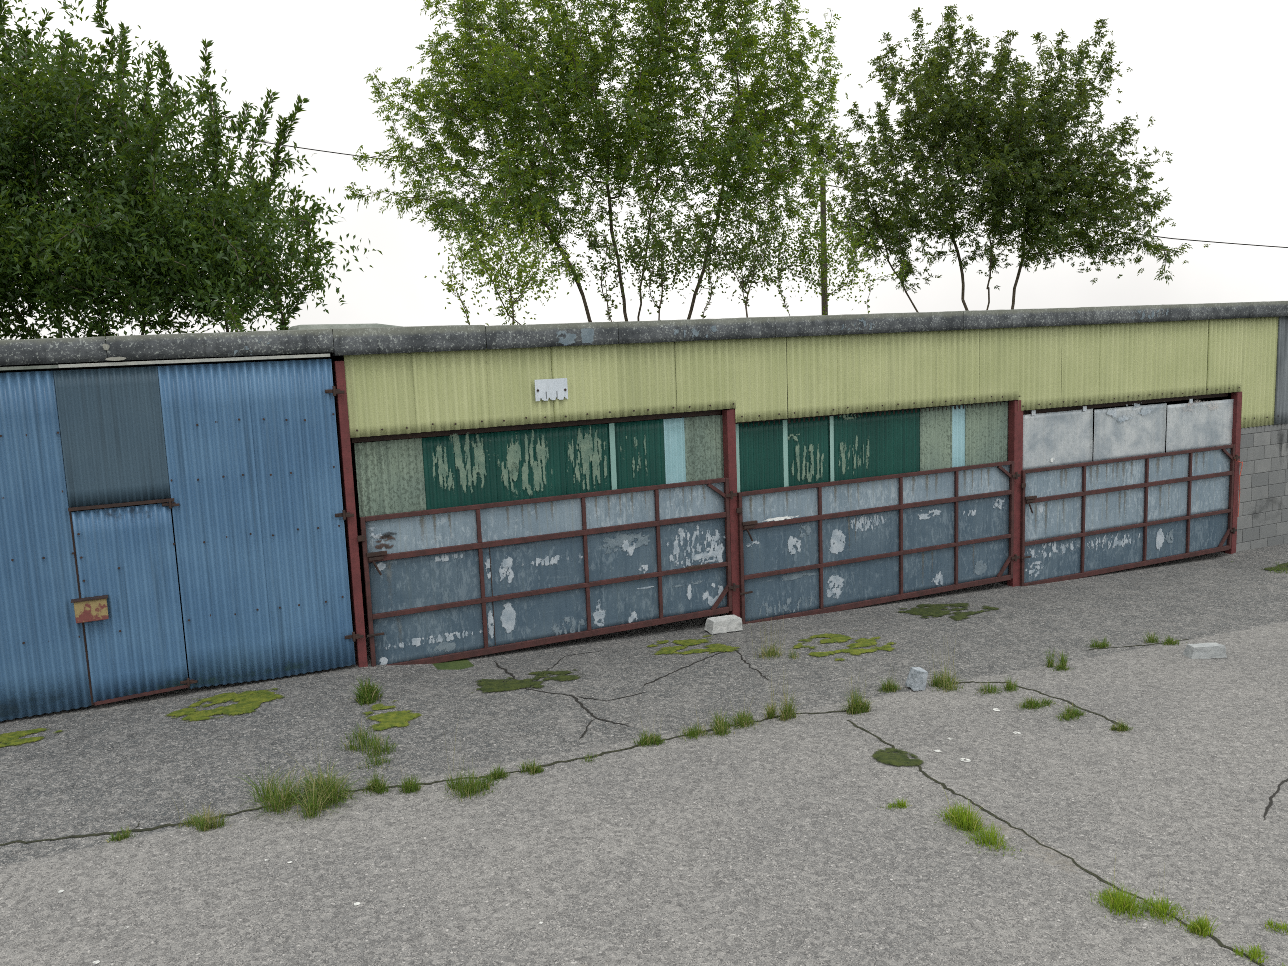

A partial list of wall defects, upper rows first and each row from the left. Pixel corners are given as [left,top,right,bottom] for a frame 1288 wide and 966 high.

peeling [433,430,552,495]
peeling [568,426,647,490]
peeling [788,434,824,482]
peeling [839,436,869,474]
peeling [485,557,514,583]
peeling [603,533,654,589]
peeling [667,525,725,568]
peeling [829,515,886,554]
peeling [674,581,723,606]
peeling [380,602,516,665]
peeling [553,600,606,635]
crack [1264,778,1288,820]